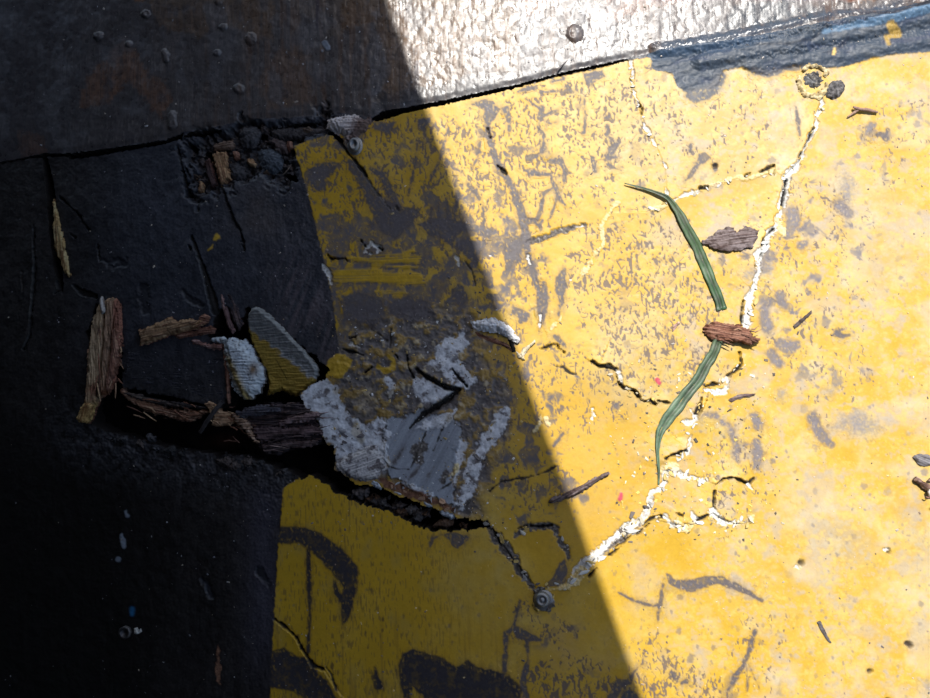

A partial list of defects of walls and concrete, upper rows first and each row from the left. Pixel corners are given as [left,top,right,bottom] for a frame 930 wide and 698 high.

crack [335,139,401,212]
crack [628,58,826,329]
peeling [300,372,397,482]
crack [322,239,384,285]
peeling [336,286,437,331]
crack [342,327,469,430]
peeling [409,328,478,467]
peeling [437,405,513,515]
crack [479,118,755,592]
peeling [913,454,930,466]
peeling [422,529,481,554]
crack [272,618,338,692]